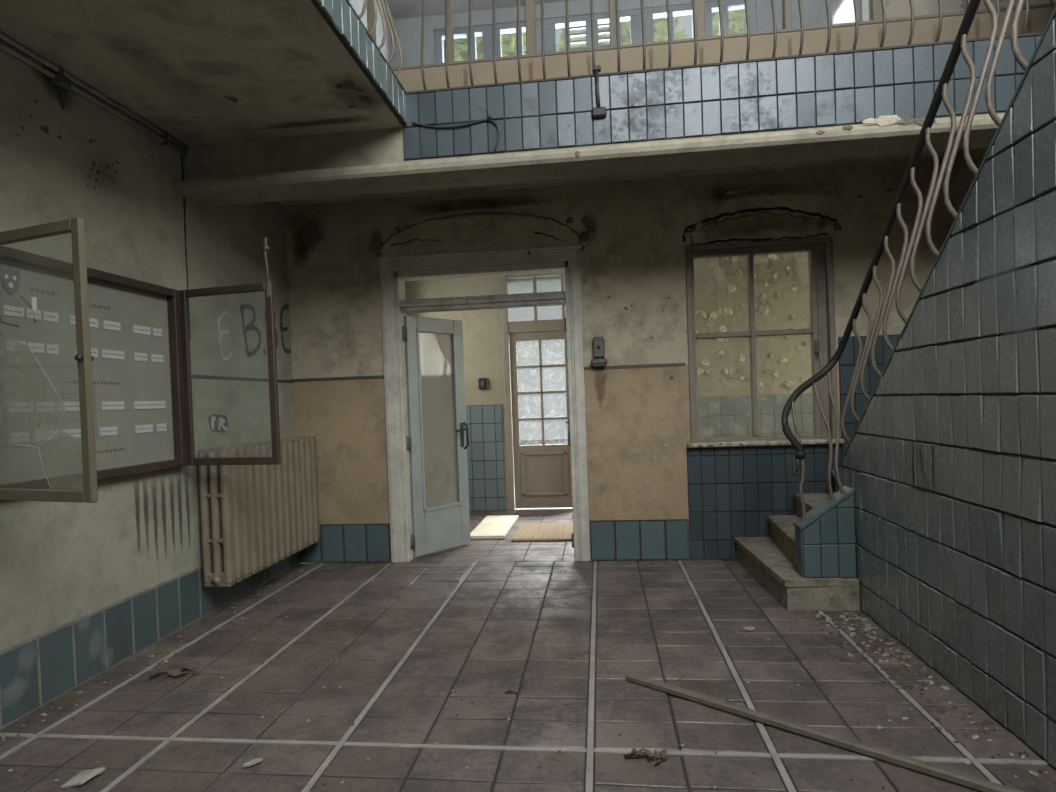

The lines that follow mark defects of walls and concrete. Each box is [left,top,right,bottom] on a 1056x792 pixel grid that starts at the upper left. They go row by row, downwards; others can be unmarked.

crack [682,207,842,245]